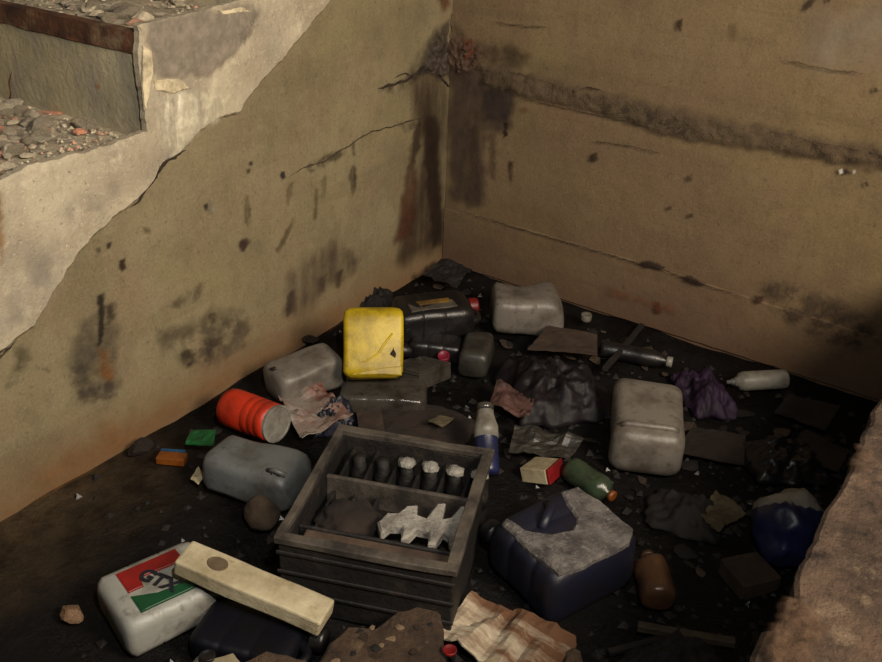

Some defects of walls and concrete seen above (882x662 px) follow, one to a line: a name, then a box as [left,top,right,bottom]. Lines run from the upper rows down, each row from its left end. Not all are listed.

crack [381,64,425,89]
crack [130,150,186,208]
crack [289,117,422,178]
damp [401,78,442,262]
damp [451,69,512,204]
damp [75,294,115,398]
damp [163,314,249,366]